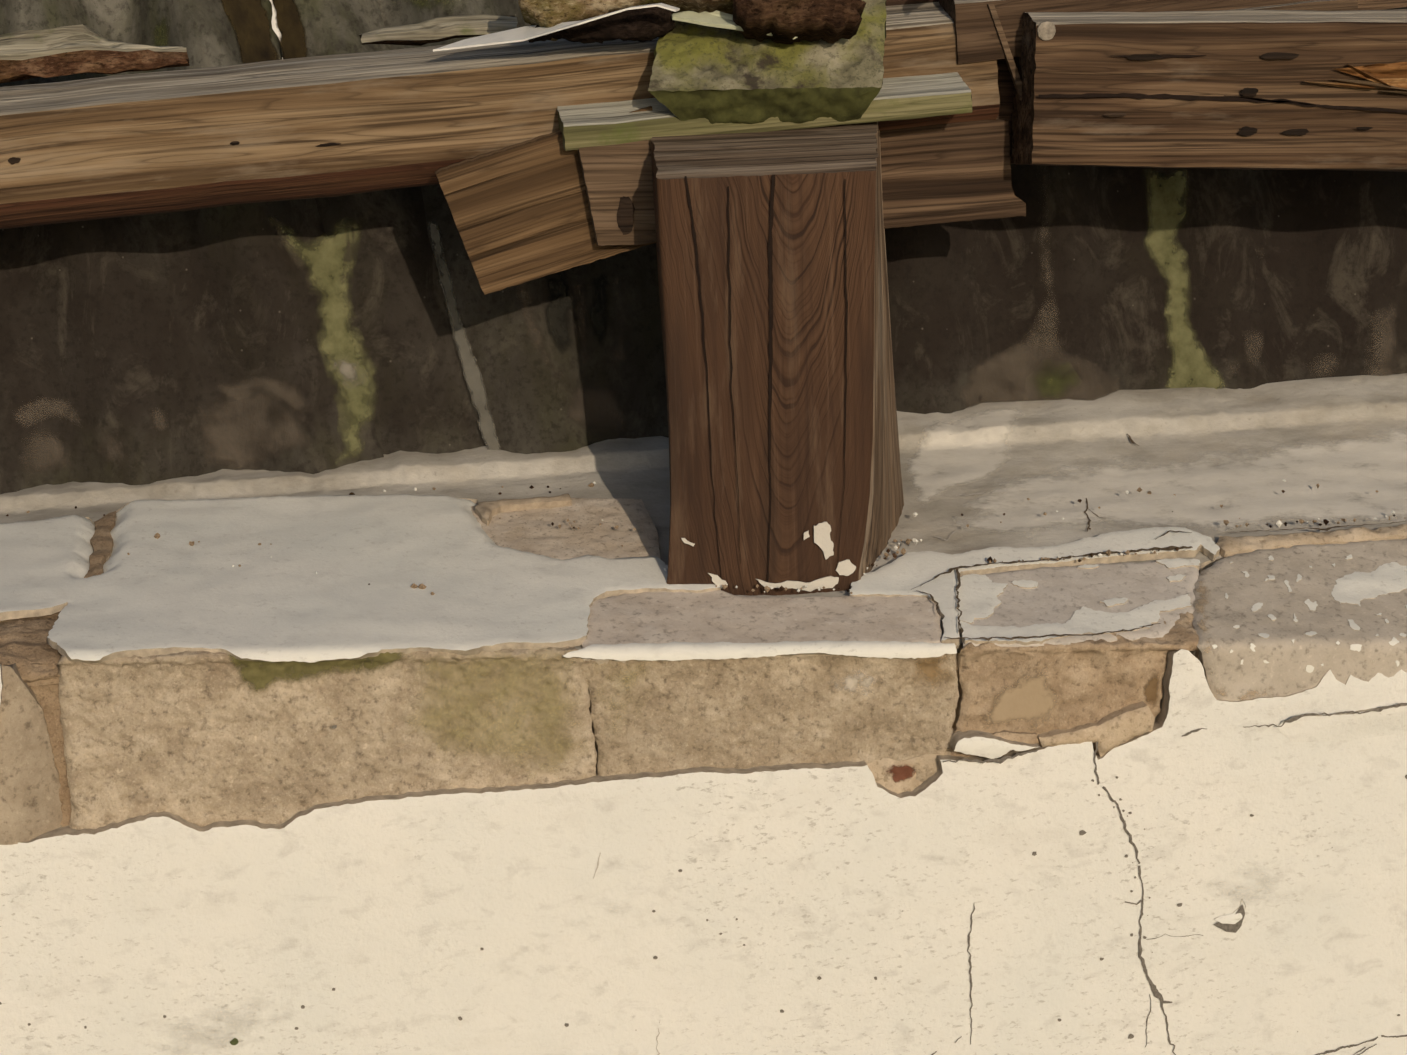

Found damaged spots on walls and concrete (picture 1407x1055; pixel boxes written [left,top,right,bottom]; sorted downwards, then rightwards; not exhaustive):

damp [339,361,357,381]
damp [17,399,78,471]
damp [205,377,303,467]
peeling [471,493,661,560]
spalling [0,511,1407,845]
crack [943,749,1039,764]
crack [1091,742,1203,1055]
crack [931,906,975,1055]
crack [1315,1035,1407,1055]